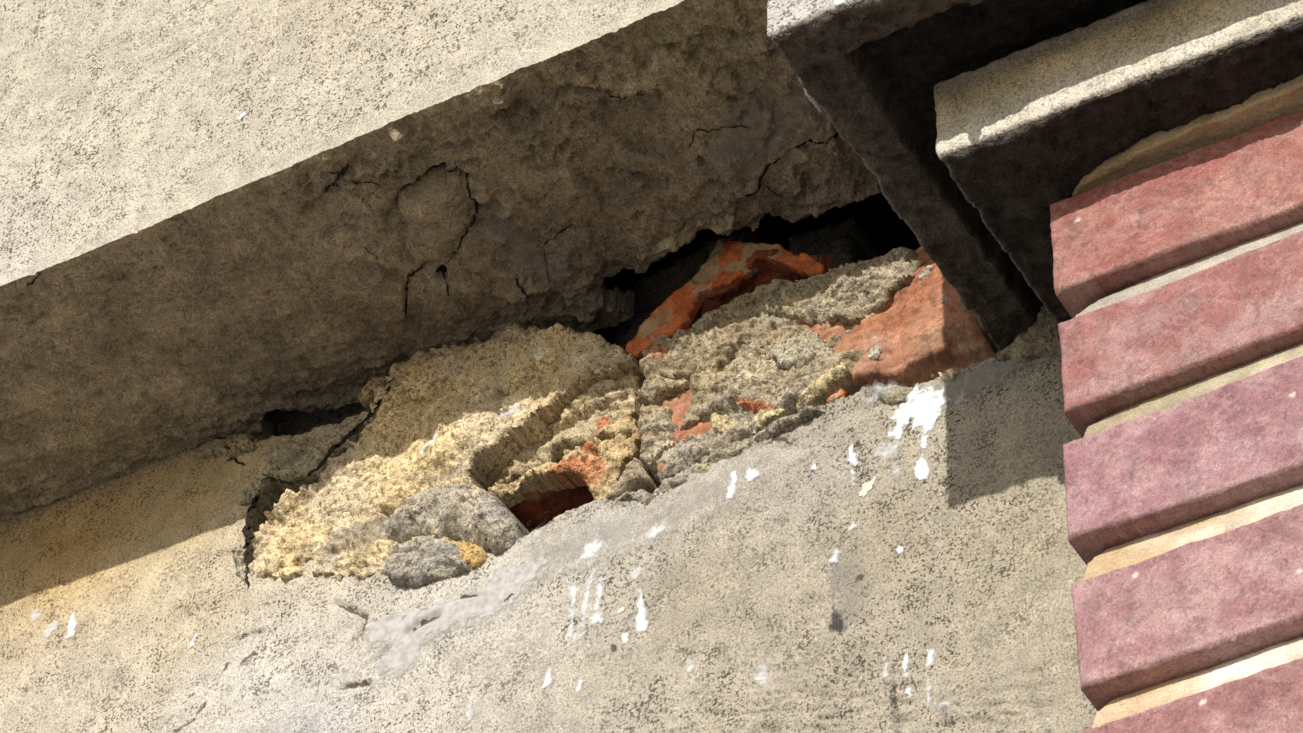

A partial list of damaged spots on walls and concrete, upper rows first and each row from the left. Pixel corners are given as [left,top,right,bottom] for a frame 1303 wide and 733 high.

crack [323,162,479,321]
flaking render [593,208,999,486]
flaking render [194,402,371,520]
damp [727,468,759,498]
damp [847,384,963,497]
flaking render [231,546,253,579]
damp [581,527,602,558]
damp [568,574,603,637]
damp [618,568,648,643]
damp [755,666,767,683]
damp [883,654,949,710]